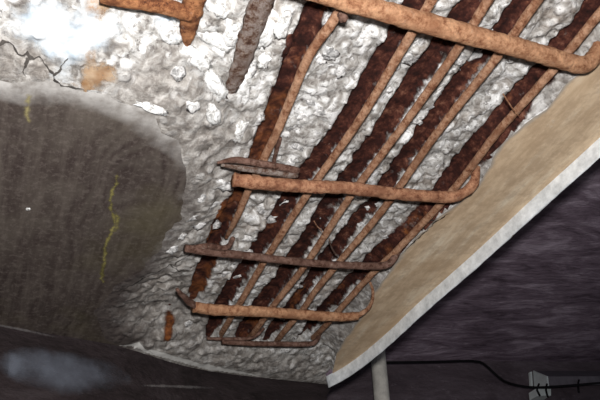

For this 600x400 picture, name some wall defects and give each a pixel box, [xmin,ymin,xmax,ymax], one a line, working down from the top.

crack [0,40,81,90]
damp [100,176,120,281]
spalling [0,0,357,384]
corrosion [240,1,348,175]
spalling [252,7,390,178]
corrosion [292,24,408,180]
spalling [269,194,457,313]
spalling [309,30,433,181]
corrosion [336,37,457,182]
corrosion [377,48,494,187]
spalling [352,43,536,191]
corrosion [432,63,549,191]